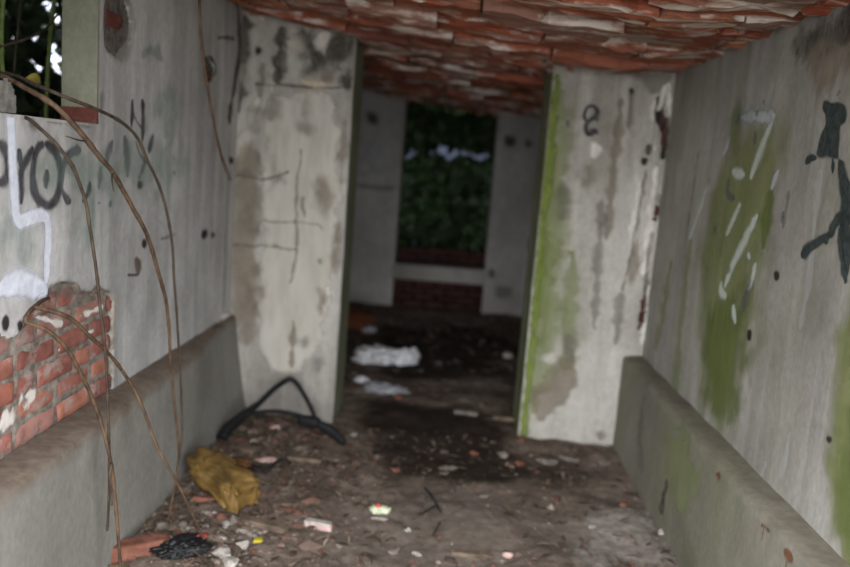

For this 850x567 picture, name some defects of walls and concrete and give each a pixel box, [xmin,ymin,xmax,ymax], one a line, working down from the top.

water stain [272,26,354,83]
water stain [605,99,623,239]
water stain [762,191,772,249]
flaking render [0,281,115,459]